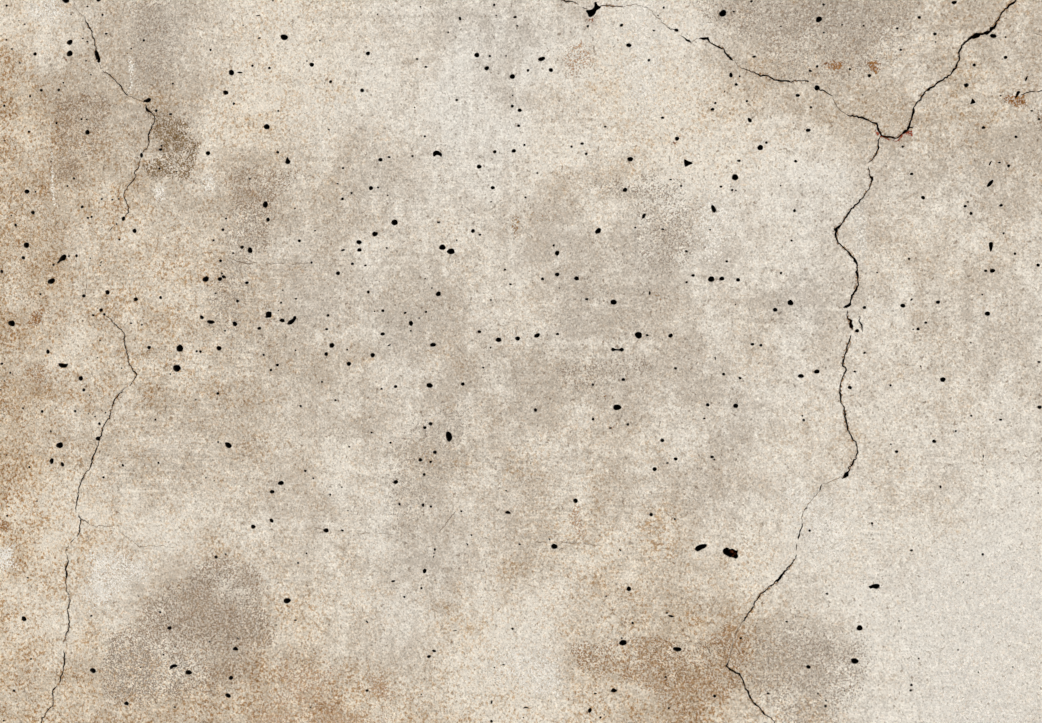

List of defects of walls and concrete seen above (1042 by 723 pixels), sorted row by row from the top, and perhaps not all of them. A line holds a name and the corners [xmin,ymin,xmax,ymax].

crack [73,3,156,231]
crack [41,317,172,723]
crack [561,0,1016,723]